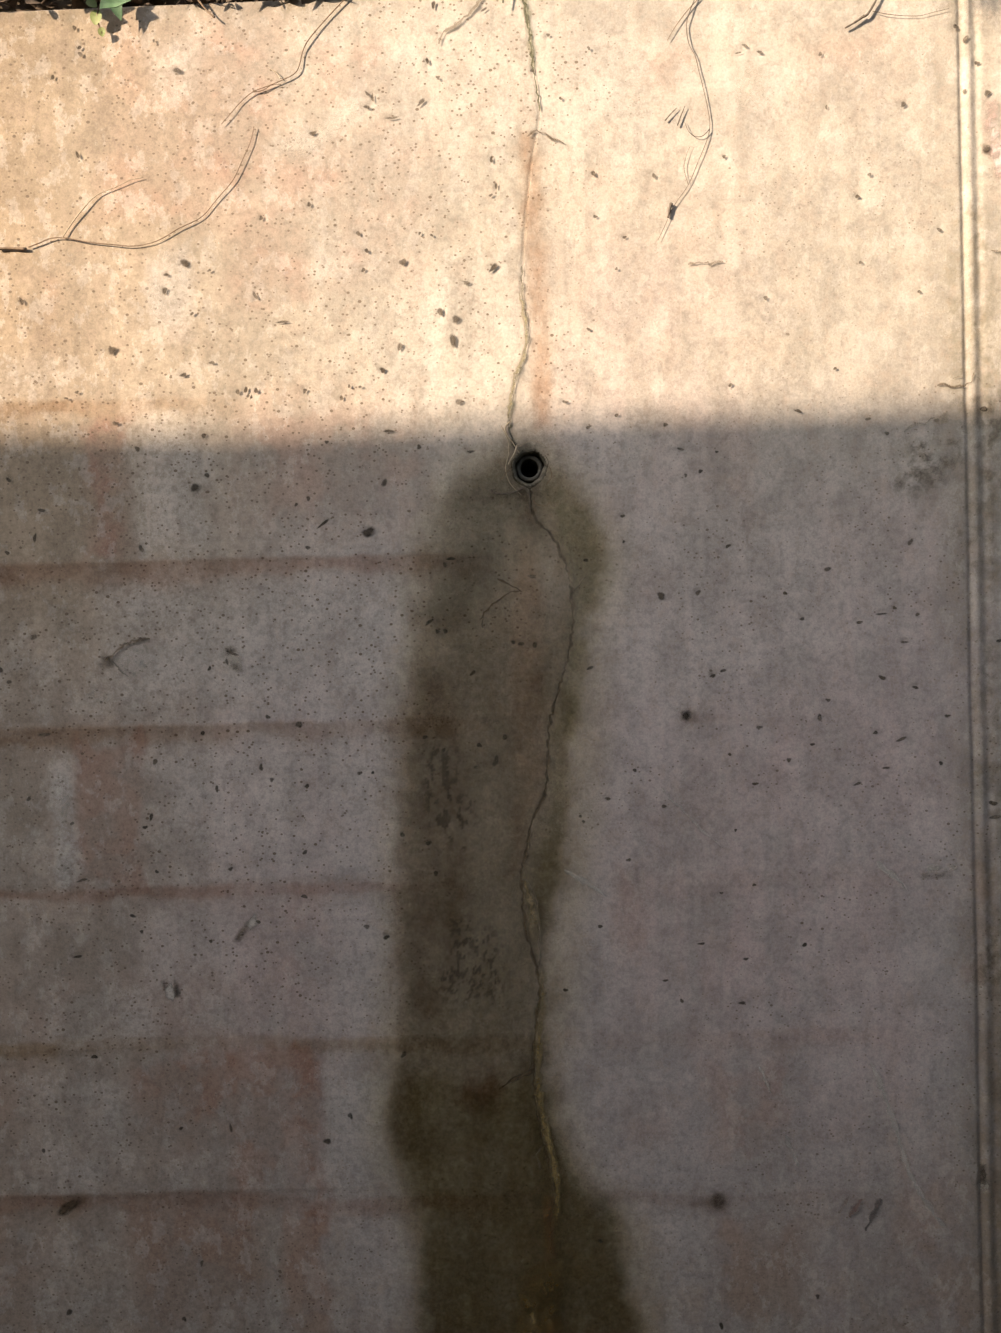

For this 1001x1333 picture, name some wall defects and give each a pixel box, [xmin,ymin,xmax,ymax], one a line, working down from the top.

crack [522,0,564,144]
crack [507,266,529,448]
crack [481,579,522,627]
crack [500,489,585,1253]